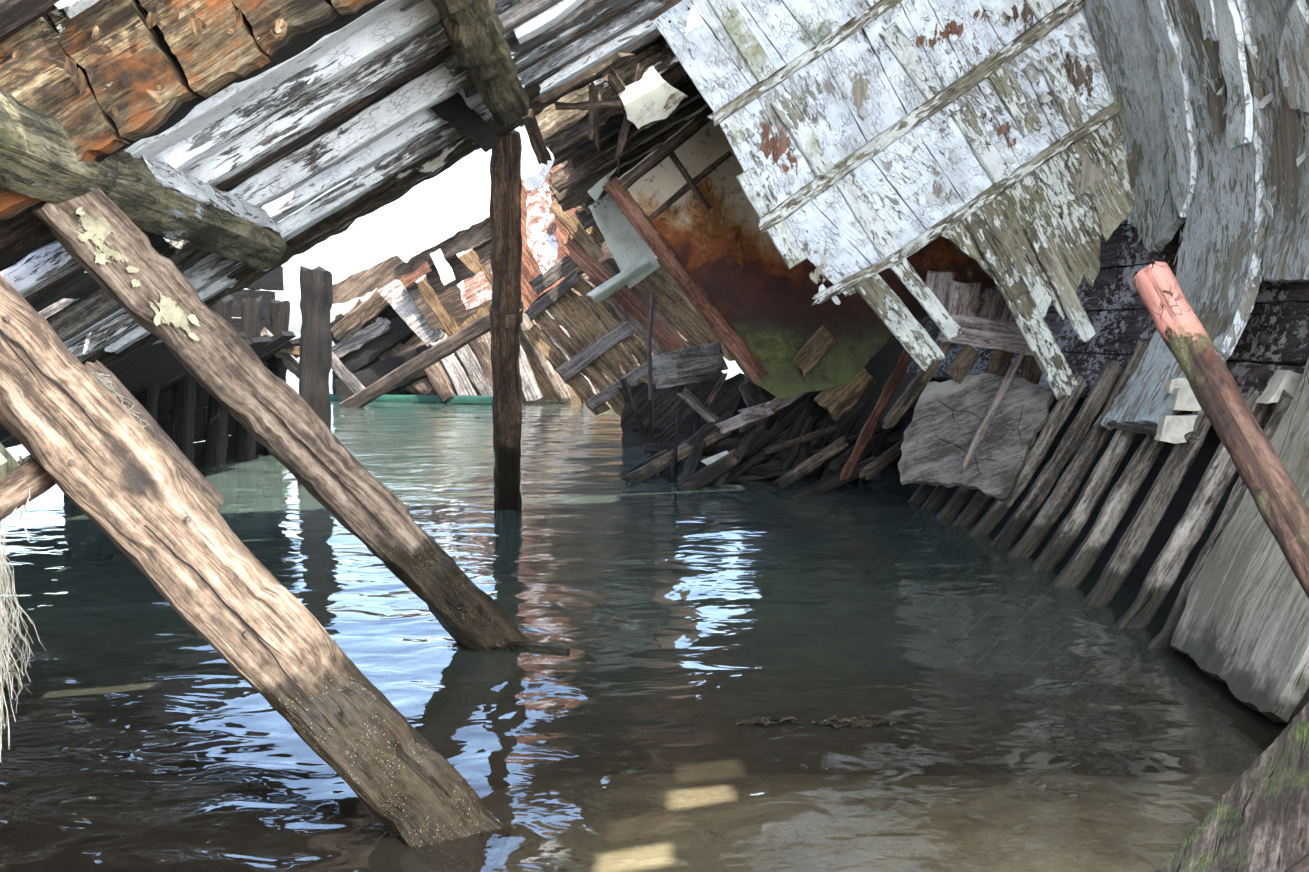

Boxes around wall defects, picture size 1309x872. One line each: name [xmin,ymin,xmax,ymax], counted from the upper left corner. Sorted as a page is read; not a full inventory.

peeling [898,0,1046,54]
peeling [842,68,871,119]
peeling [754,123,802,184]
peeling [925,159,957,204]
peeling [1033,0,1233,346]
peeling [1244,0,1309,279]
peeling [70,207,141,288]
peeling [802,241,841,305]
peeling [148,290,200,341]
peeling [1094,336,1169,425]